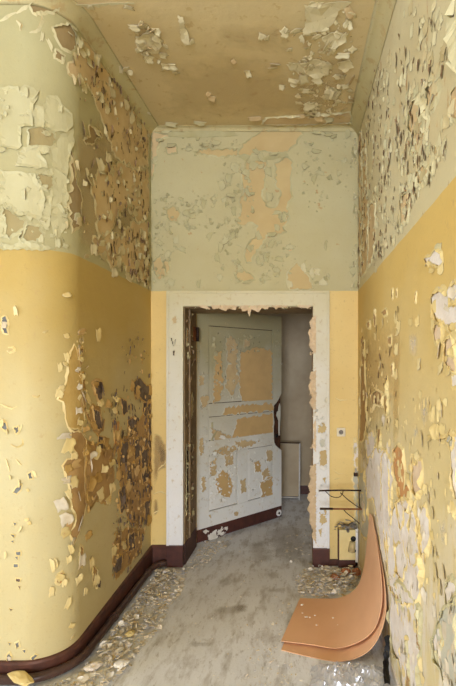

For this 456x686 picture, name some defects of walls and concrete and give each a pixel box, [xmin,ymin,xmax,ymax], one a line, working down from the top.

peeling [0,0,456,291]
peeling [48,328,153,598]
peeling [185,304,316,539]
peeling [307,365,328,543]
flaking render [351,279,456,686]